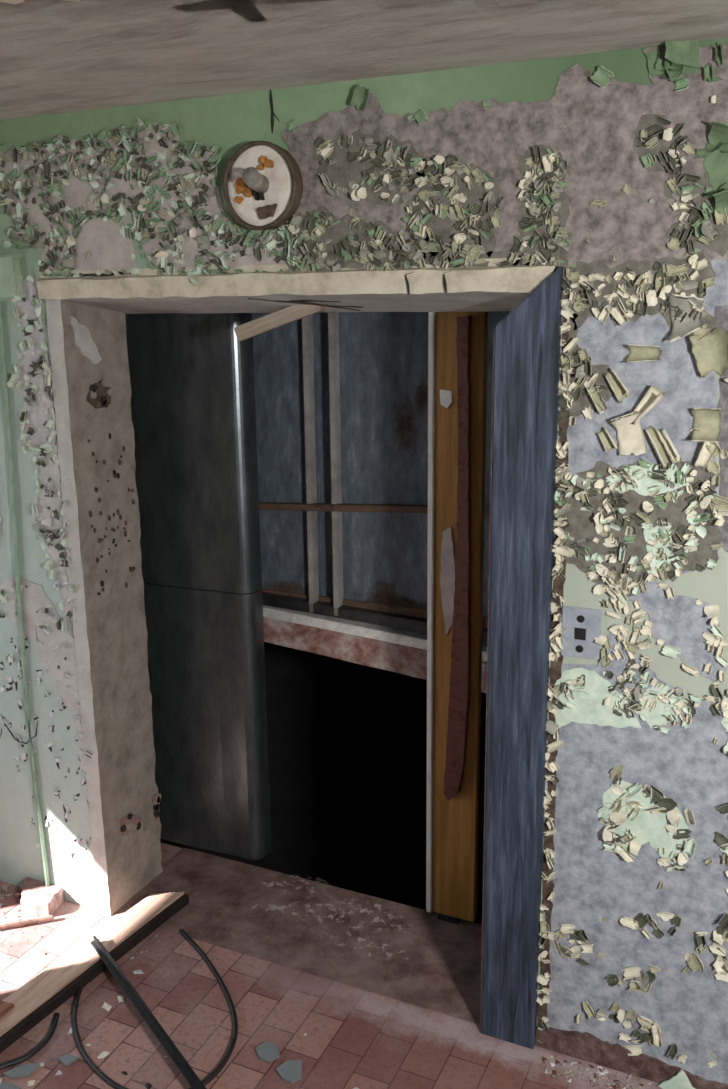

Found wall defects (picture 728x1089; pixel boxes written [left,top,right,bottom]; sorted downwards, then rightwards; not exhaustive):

peeling [0,40,728,284]
flaking render [69,316,102,364]
flaking render [86,379,114,408]
peeling [0,274,93,786]
flaking render [88,440,130,595]
peeling [536,253,728,1084]
peeling [69,837,91,858]
flaking render [120,813,141,837]
flaking render [151,793,161,822]